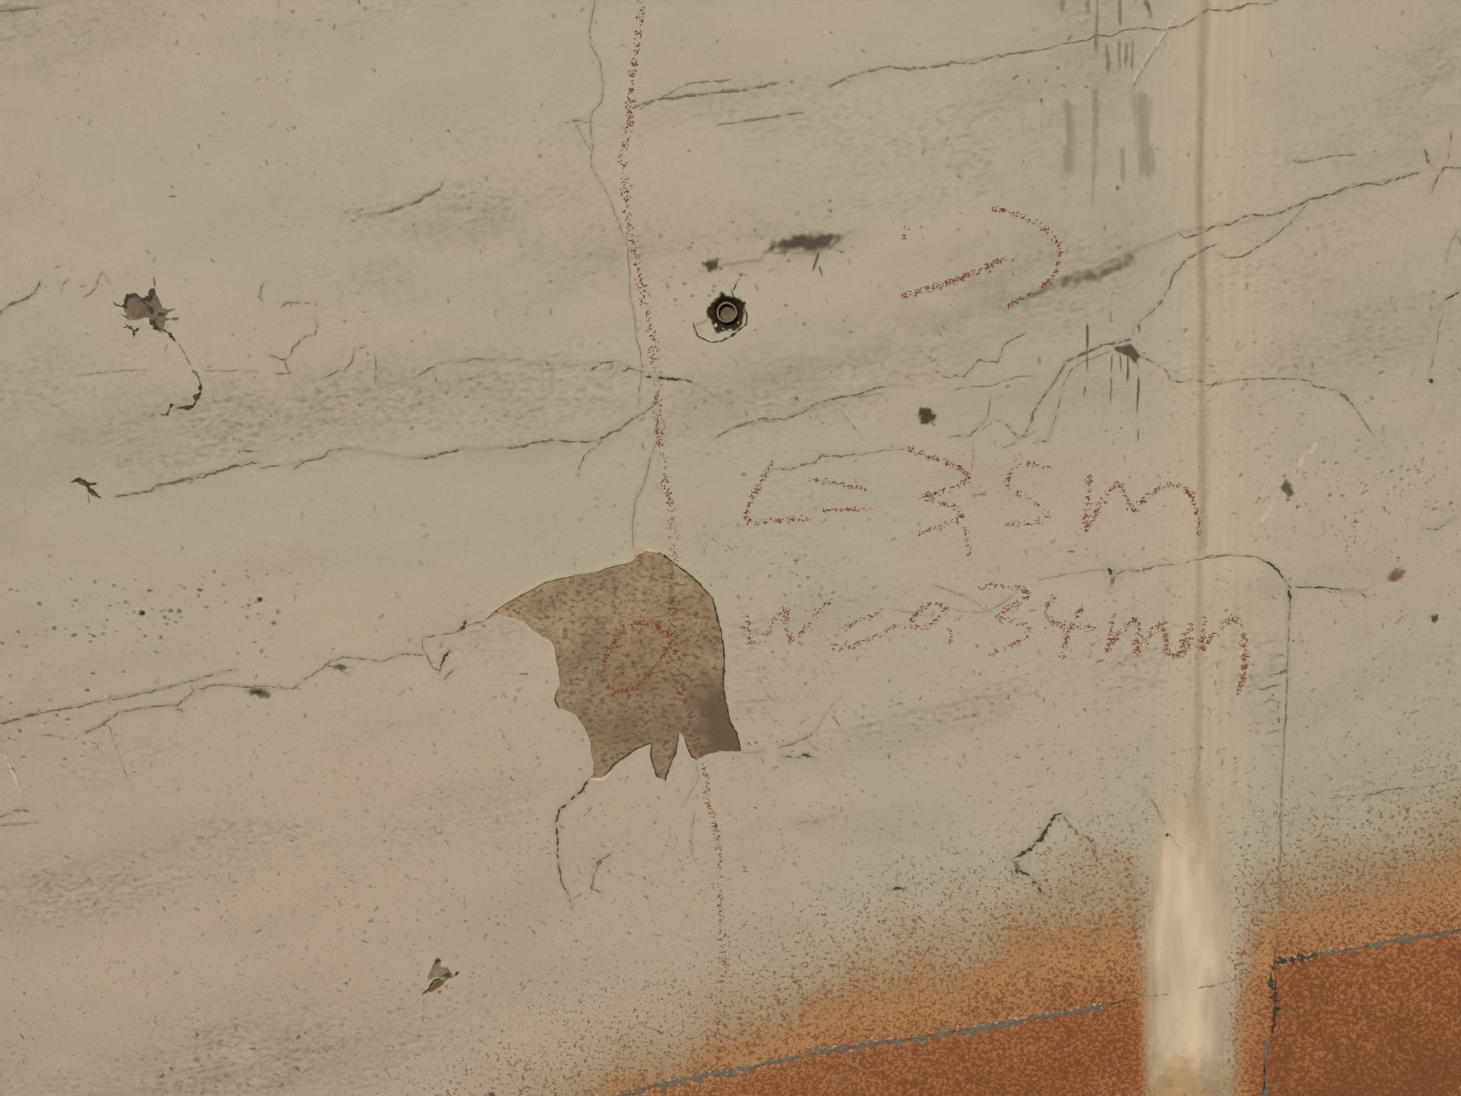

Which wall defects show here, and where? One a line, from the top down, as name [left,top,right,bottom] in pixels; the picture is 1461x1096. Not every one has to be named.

crack [829,0,1276,87]
crack [508,3,904,548]
crack [937,131,1461,471]
crack [115,448,341,497]
crack [416,449,459,460]
crack [0,620,483,740]
peeling [479,542,747,787]
crack [0,809,39,826]
crack [555,778,611,907]
crack [588,554,1461,1096]
leakage [1149,810,1223,1096]